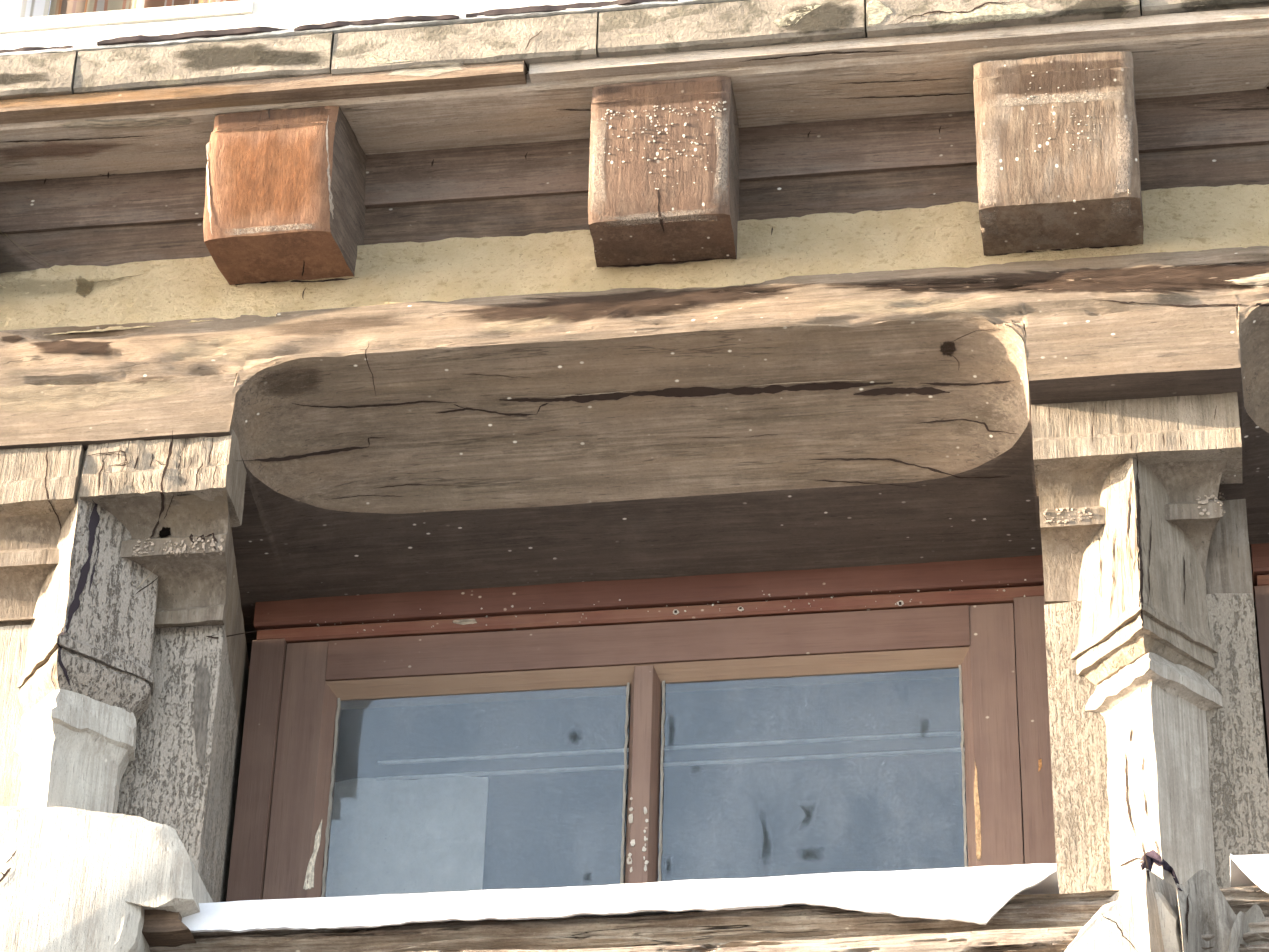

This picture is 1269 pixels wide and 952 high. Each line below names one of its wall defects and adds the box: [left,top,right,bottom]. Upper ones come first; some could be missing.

damp [784,3,853,34]
damp [1053,0,1127,16]
damp [1183,0,1269,10]
damp [458,262,1269,322]
damp [2,335,111,354]
crack [292,344,1014,434]
crack [811,458,1011,487]
crack [324,484,452,500]
crack [1099,434,1181,630]
crack [45,430,383,698]